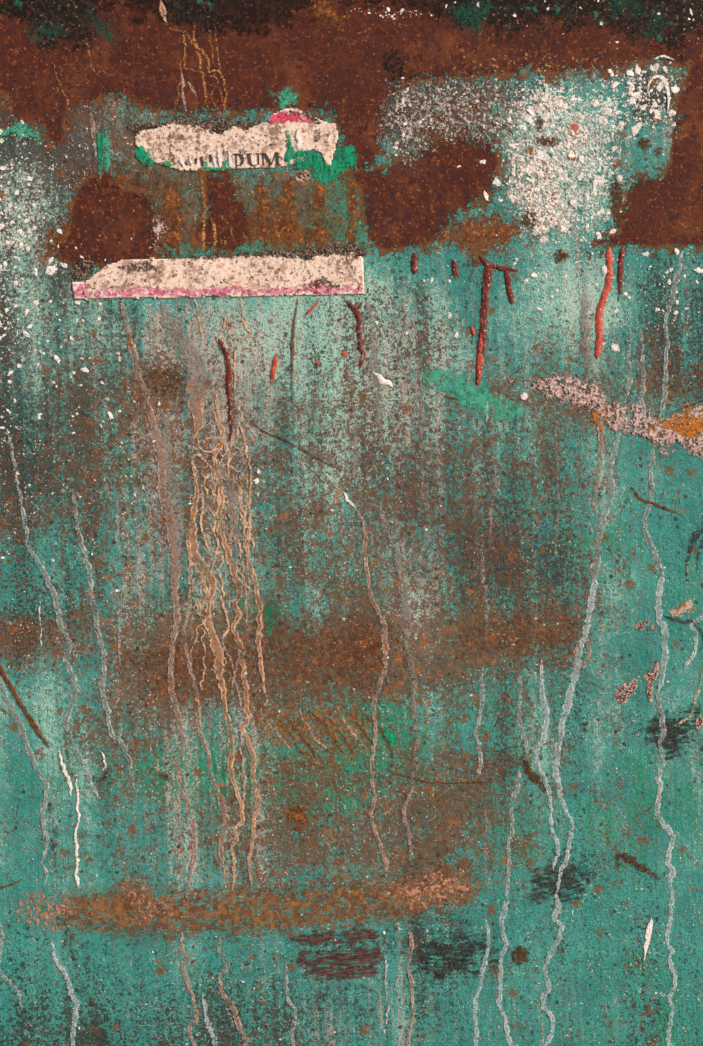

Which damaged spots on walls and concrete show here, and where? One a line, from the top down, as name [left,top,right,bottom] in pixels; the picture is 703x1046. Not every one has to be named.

corrosion [0,0,703,281]
water stain [200,170,233,253]
water stain [87,260,269,897]
corrosion [118,611,414,769]
corrosion [450,600,590,668]
corrosion [8,860,483,941]
water stain [179,934,217,1046]